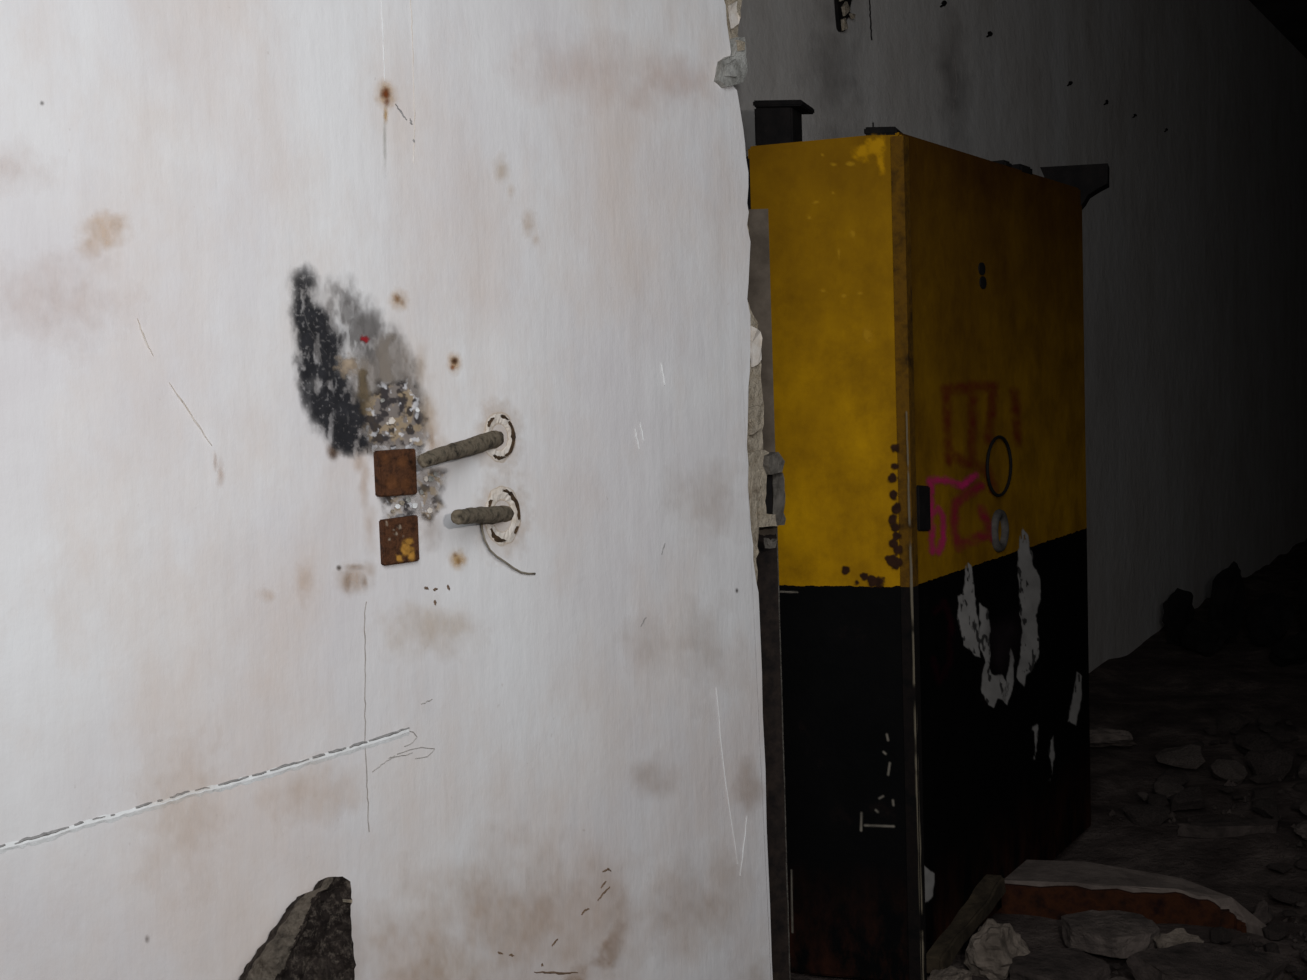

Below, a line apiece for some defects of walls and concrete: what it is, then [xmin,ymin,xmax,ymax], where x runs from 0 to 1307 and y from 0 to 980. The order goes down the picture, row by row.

peeling [366,382,445,520]
spalling [483,412,516,463]
crack [0,601,435,854]